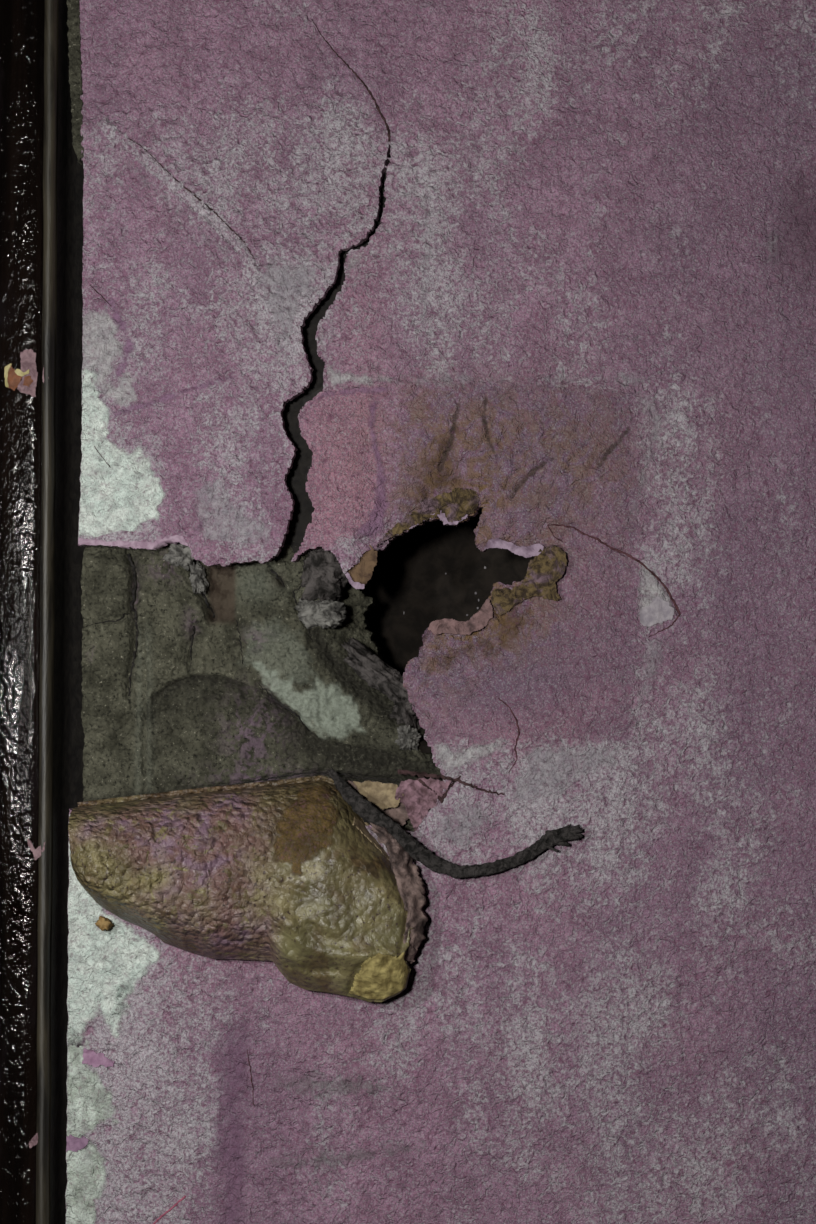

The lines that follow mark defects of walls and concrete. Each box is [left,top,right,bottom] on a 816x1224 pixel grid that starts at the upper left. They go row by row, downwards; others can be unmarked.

crack [283,19,391,553]
spalling [65,300,568,1224]